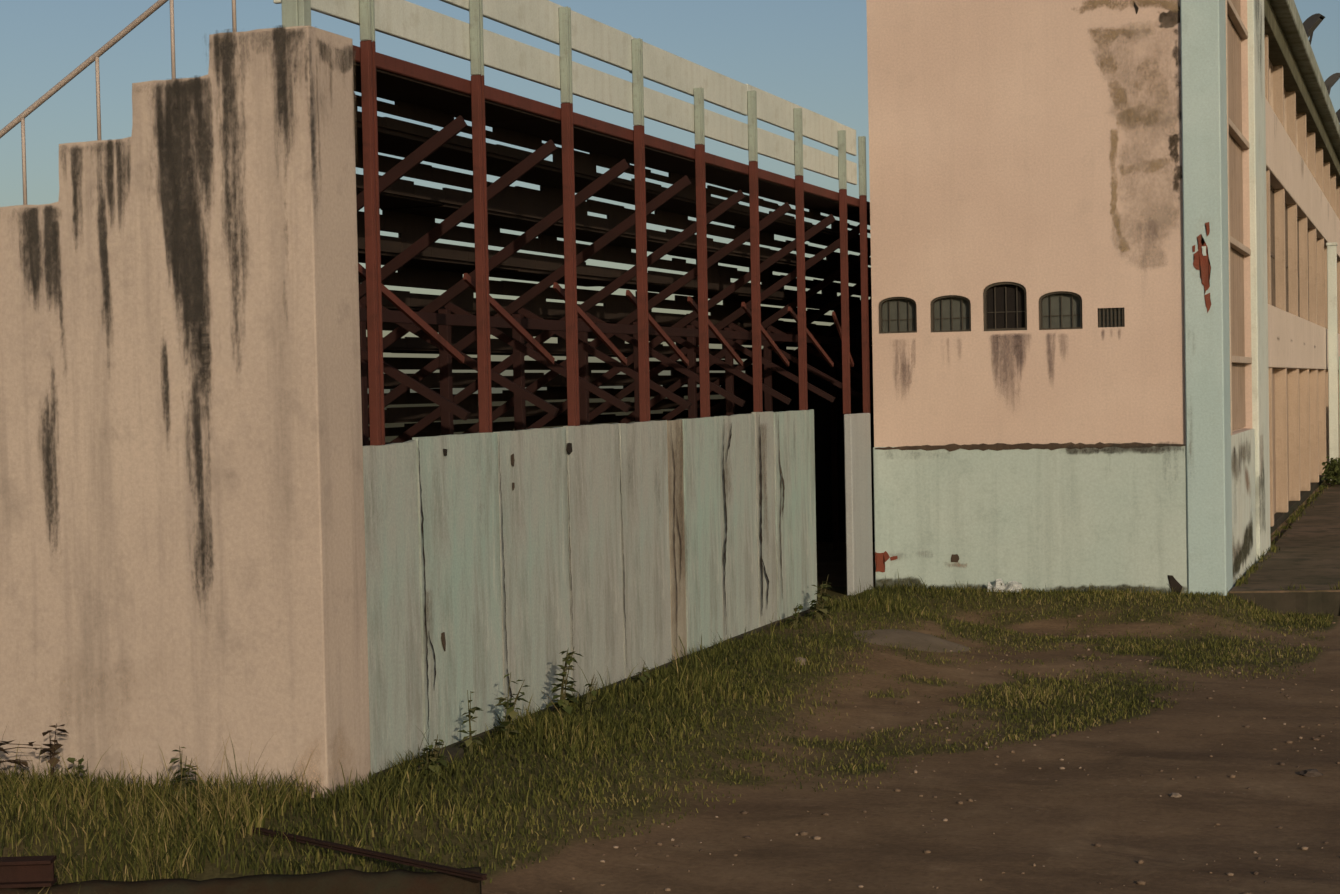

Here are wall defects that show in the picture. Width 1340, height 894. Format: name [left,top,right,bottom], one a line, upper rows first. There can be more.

water stain [273,25,355,129]
peeling [1081,0,1181,86]
water stain [23,207,62,323]
water stain [71,148,81,238]
water stain [97,140,130,335]
water stain [156,30,245,589]
peeling [1091,29,1182,252]
peeling [1192,222,1211,313]
water stain [42,373,57,534]